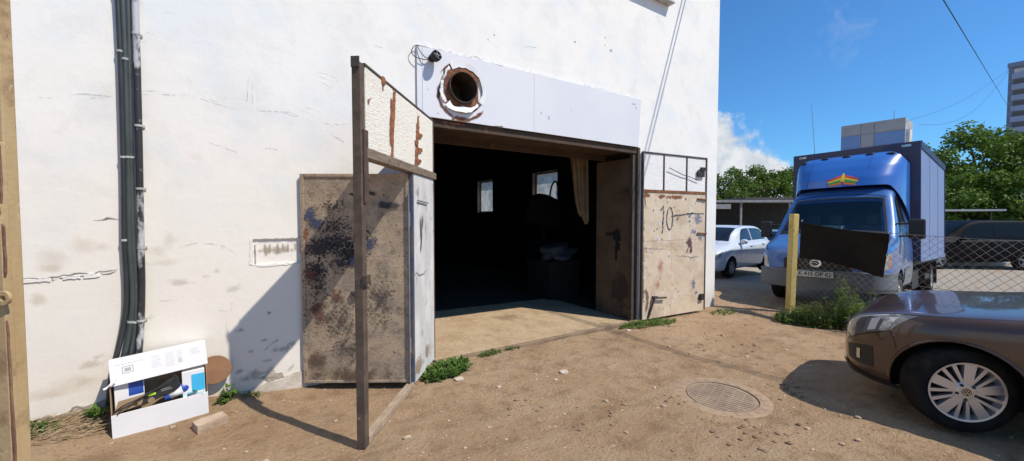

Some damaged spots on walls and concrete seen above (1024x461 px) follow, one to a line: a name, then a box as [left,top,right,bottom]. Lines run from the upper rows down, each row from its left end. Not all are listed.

rust [381,76,396,158]
rust [415,116,423,167]
rust [437,83,483,126]